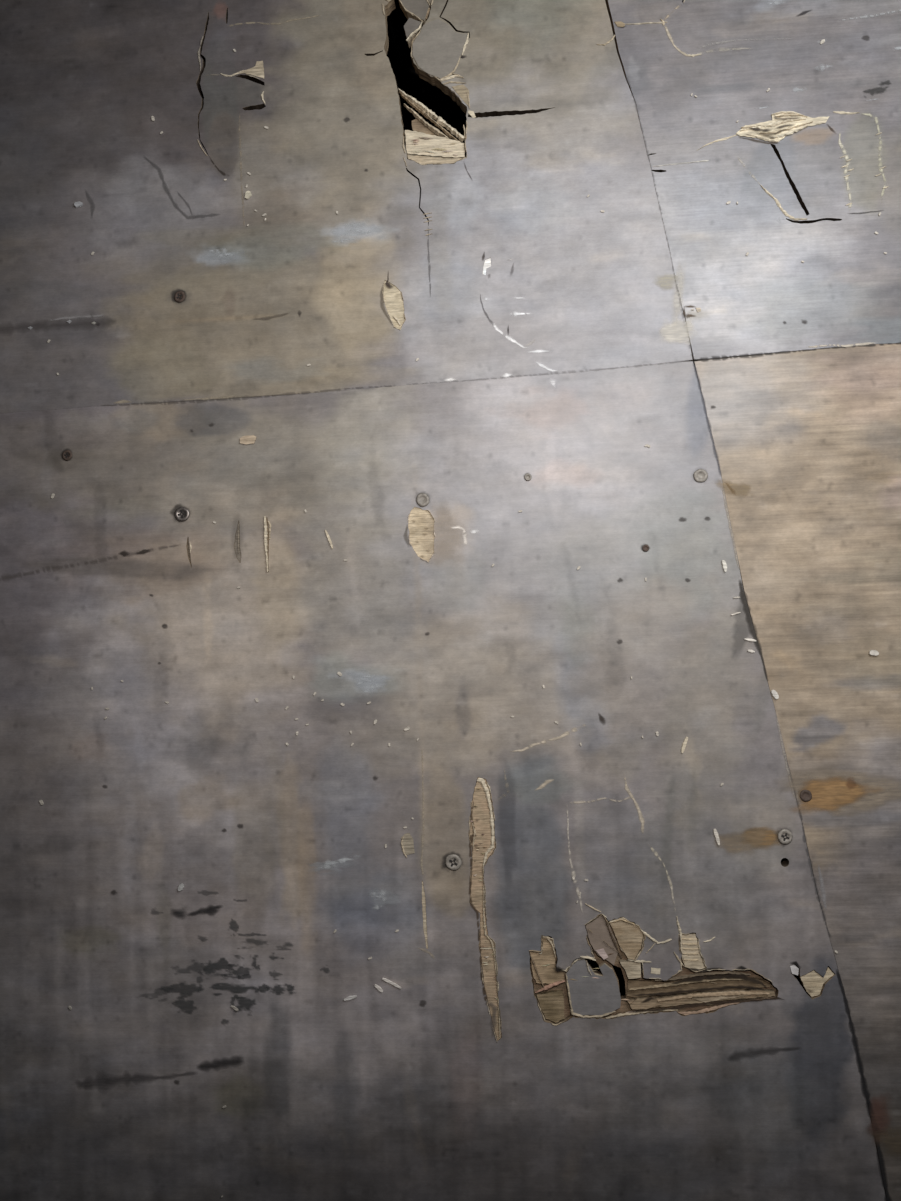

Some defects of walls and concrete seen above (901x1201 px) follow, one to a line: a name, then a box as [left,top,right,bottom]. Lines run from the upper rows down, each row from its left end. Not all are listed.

crack [196,8,228,175]
spalling [381,278,406,330]
spalling [405,507,436,563]
spalling [468,777,502,1040]
spalling [790,962,834,997]